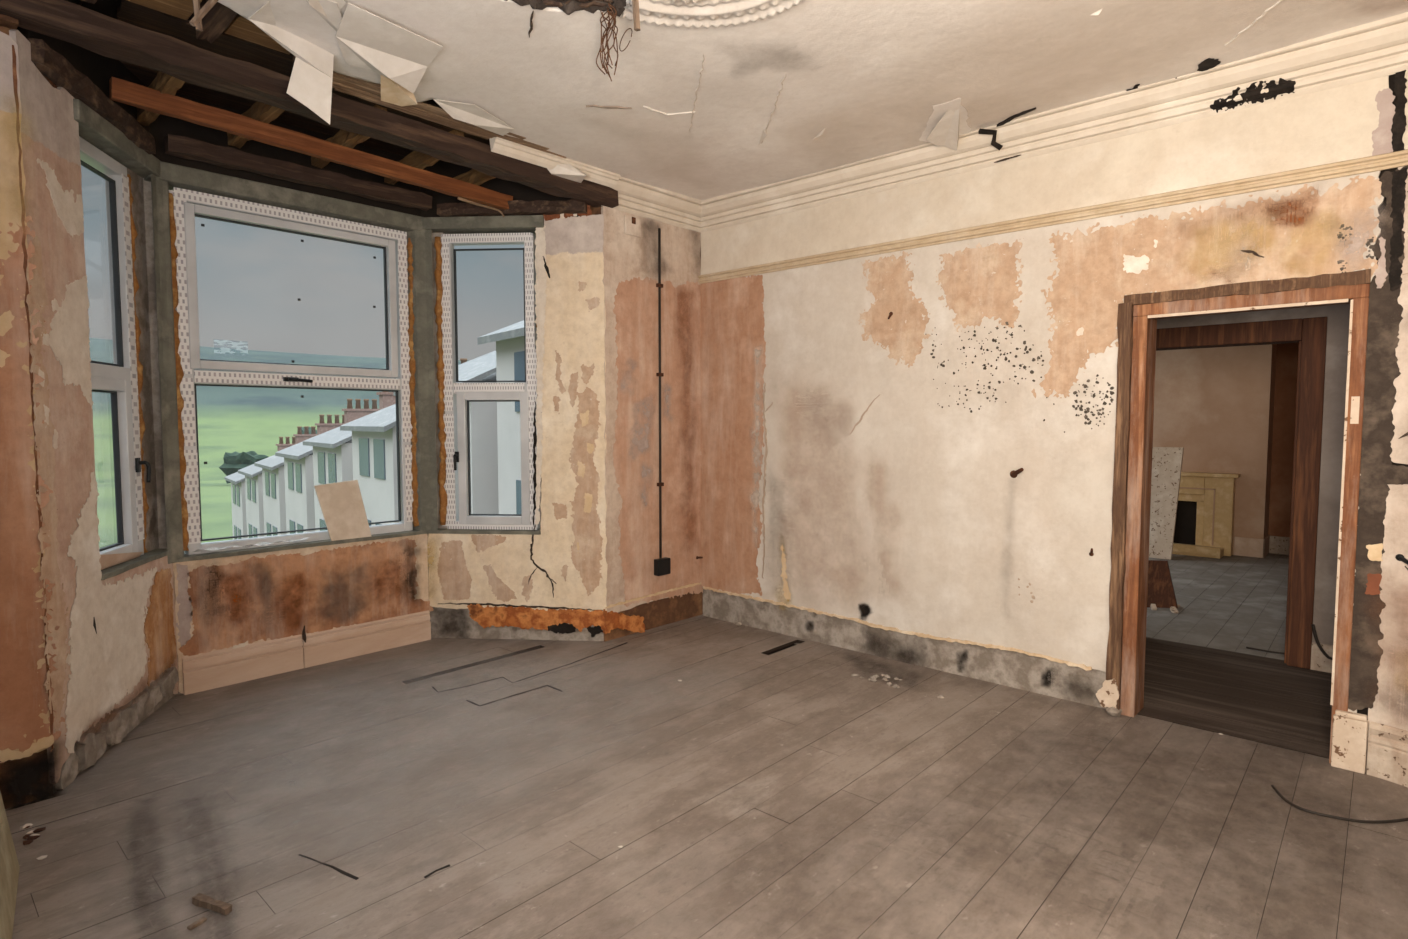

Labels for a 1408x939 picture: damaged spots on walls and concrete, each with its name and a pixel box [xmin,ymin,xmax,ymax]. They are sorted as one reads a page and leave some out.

flaking render [505,0,626,17]
flaking render [1372,88,1396,156]
peeling [37,158,84,237]
flaking render [543,205,592,221]
flaking render [858,175,1388,398]
water stain [925,322,1044,413]
water stain [1072,374,1114,429]
peeling [0,216,533,791]
crack [438,402,603,611]
water stain [377,546,433,599]